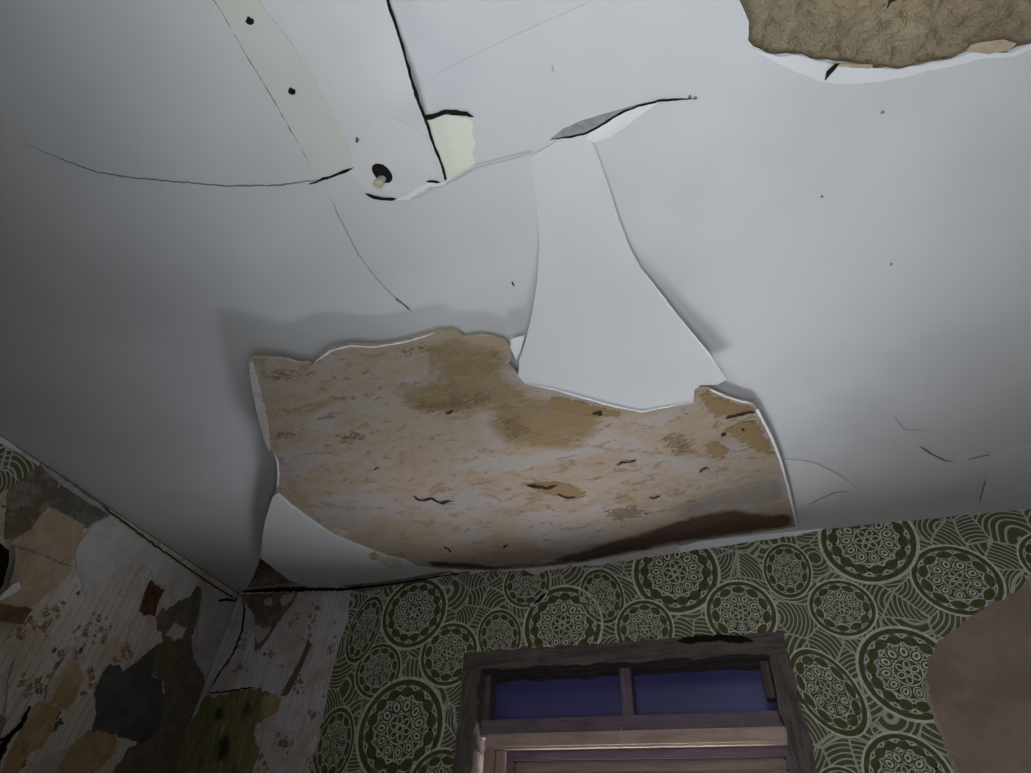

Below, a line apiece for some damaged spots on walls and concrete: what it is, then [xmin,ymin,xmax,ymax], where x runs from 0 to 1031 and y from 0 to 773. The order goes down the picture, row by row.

spalling [740,0,1031,84]
crack [24,0,317,187]
crack [550,98,694,140]
crack [365,193,396,201]
peeling [510,335,525,360]
damp [410,347,594,446]
peeling [550,397,621,419]
peeling [700,391,774,459]
crack [894,417,990,502]
flaking render [0,465,204,773]
peeling [240,591,298,654]
damp [171,687,277,773]